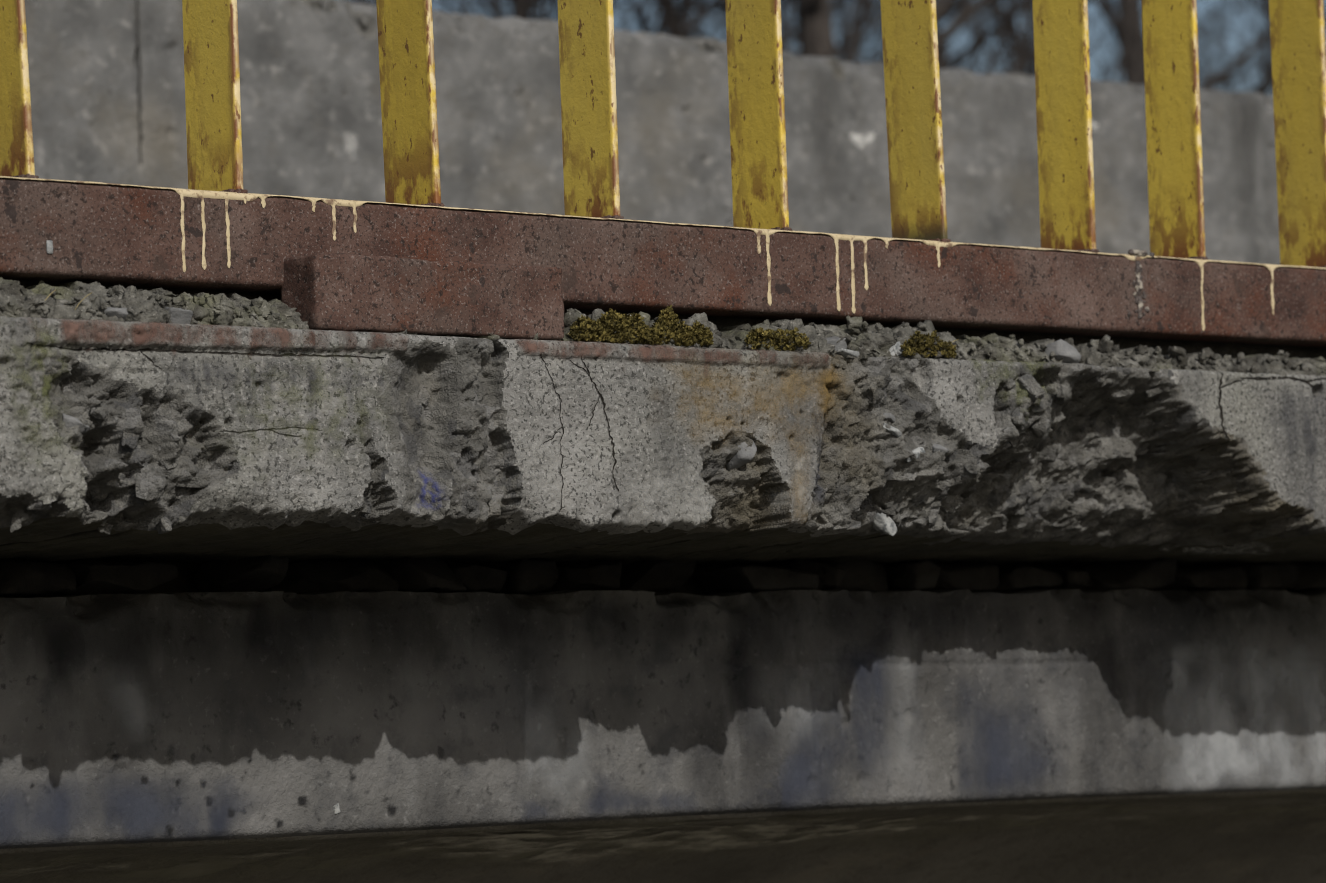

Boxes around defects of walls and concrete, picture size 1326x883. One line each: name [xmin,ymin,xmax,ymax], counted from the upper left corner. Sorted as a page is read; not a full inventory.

spalling [0,349,240,535]
spalling [326,338,523,536]
crack [540,354,619,512]
spalling [684,429,792,535]
spalling [808,348,1326,548]
water stain [1170,649,1326,784]
water stain [103,821,759,879]